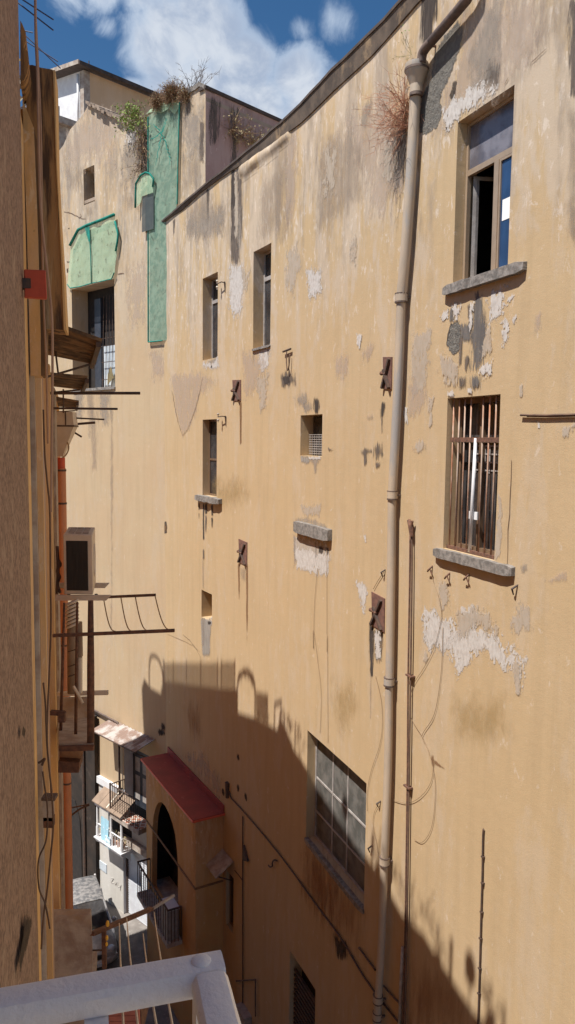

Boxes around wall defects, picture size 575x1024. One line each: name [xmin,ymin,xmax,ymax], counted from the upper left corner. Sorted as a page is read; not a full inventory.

spalling [419,1,501,135]
damp [183,98,243,265]
peeling [284,241,323,300]
flaking render [403,285,520,452]
flaking render [293,536,331,577]
flaking render [421,581,530,695]